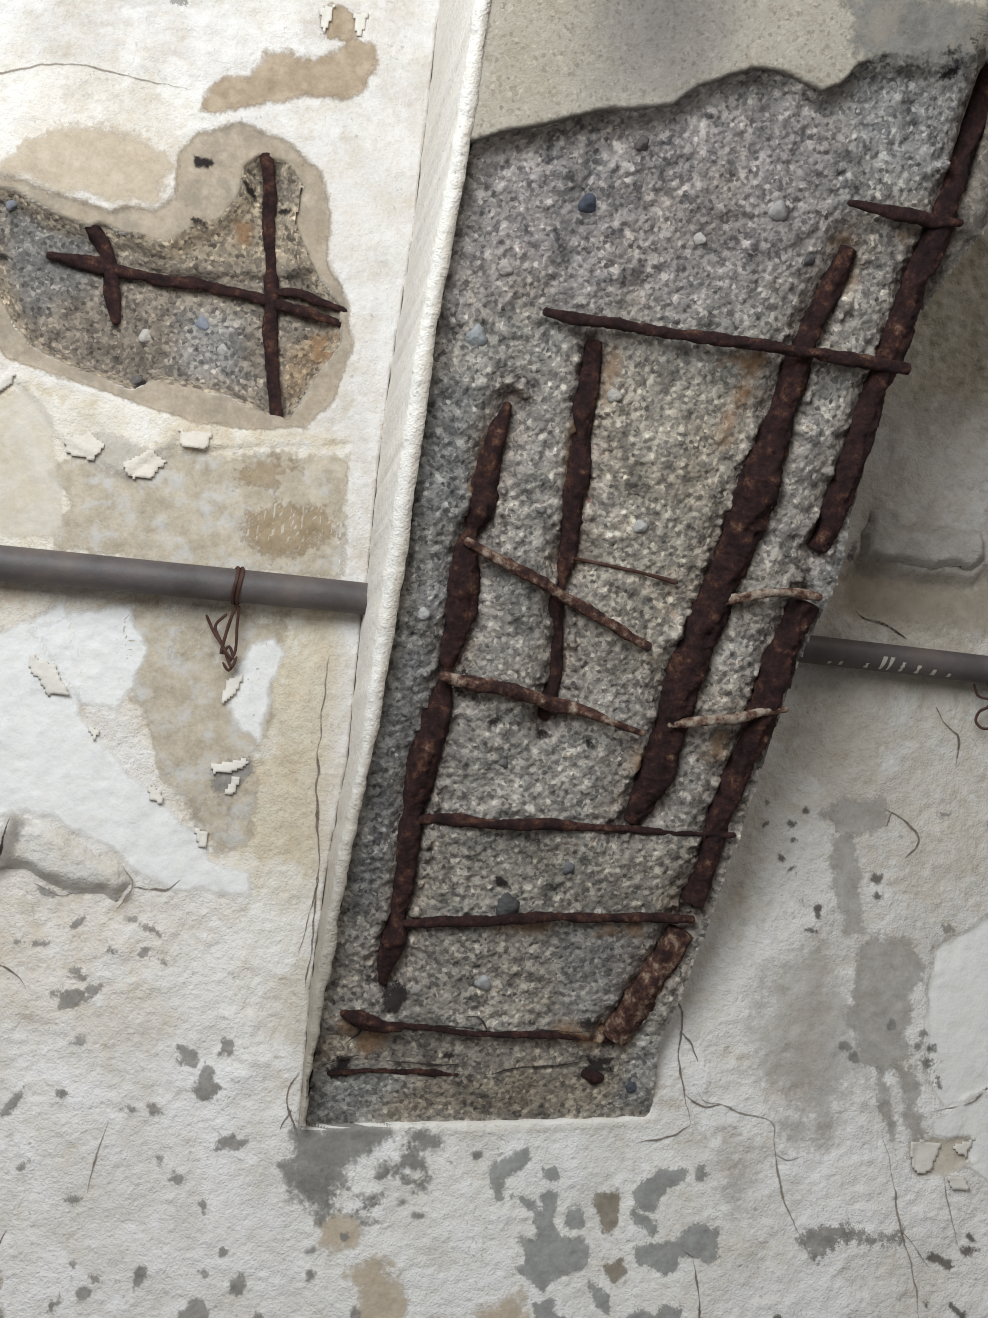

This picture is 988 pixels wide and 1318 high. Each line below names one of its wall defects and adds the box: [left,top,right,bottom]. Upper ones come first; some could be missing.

crack [0,63,187,89]
damp [844,0,988,70]
spalling [0,122,354,450]
peeling [0,601,253,896]
peeling [221,639,284,742]
spalling [306,31,988,1125]
crack [684,1251,701,1318]
crack [637,1003,808,1252]
damp [819,798,938,1147]
crack [882,1131,929,1318]
peeling [909,917,988,1190]
crack [932,1088,988,1112]